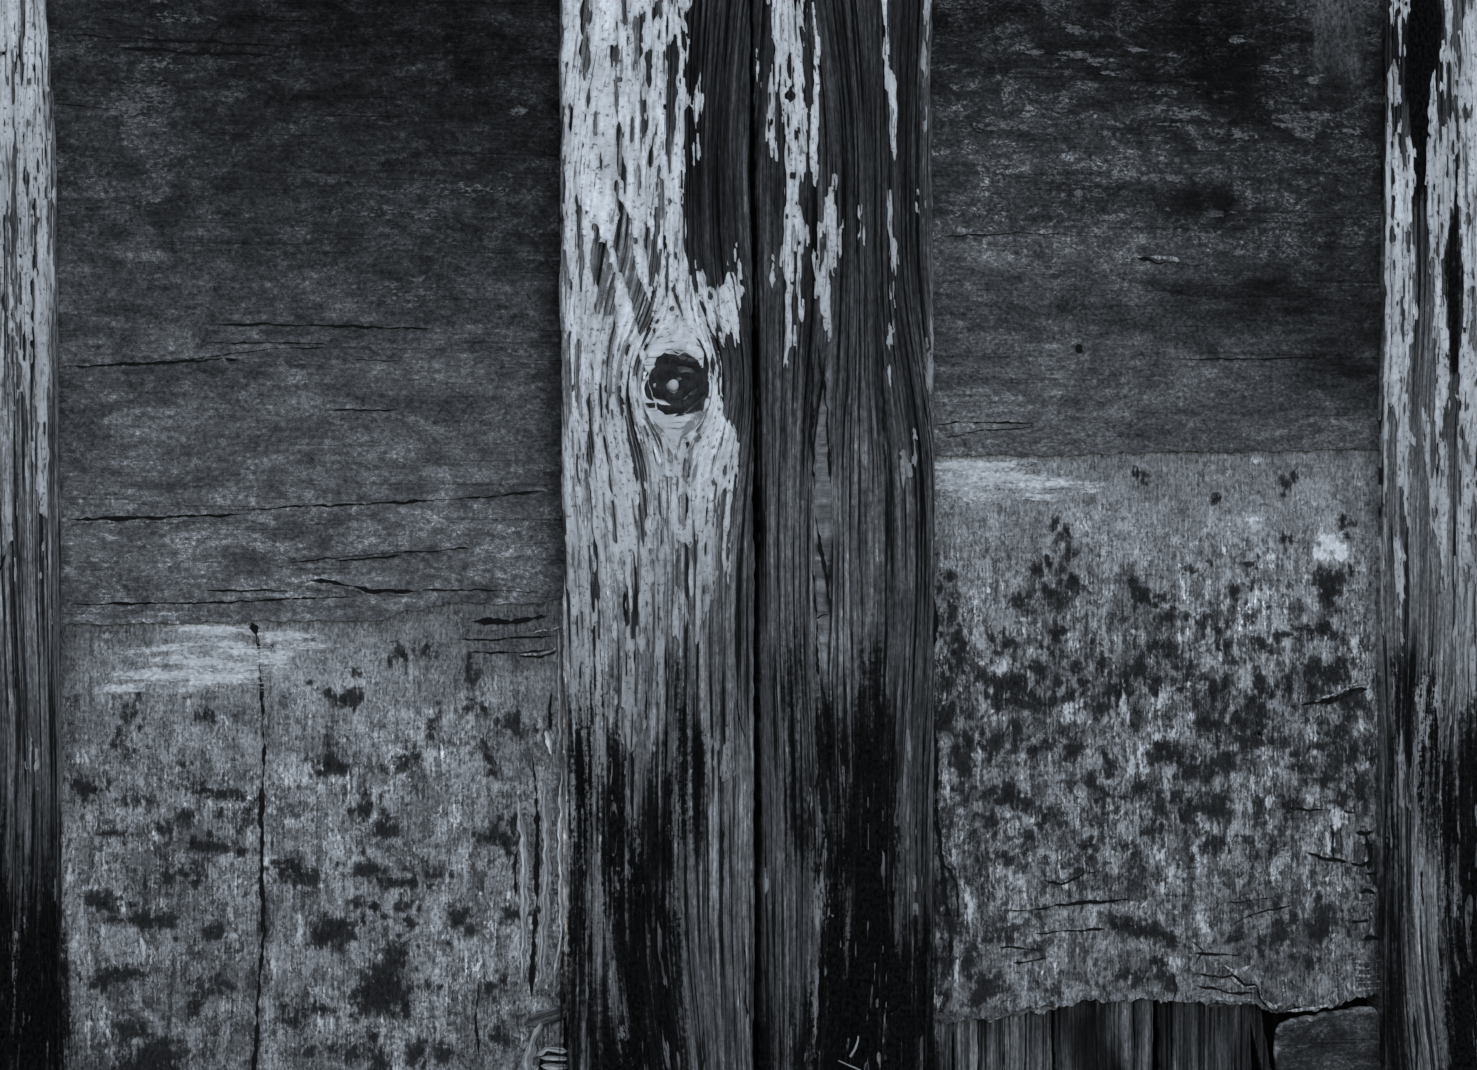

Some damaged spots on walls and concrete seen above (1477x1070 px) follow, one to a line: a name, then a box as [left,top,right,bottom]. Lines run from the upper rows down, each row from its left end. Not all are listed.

peeling [0,0,56,581]
water stain [0,797,204,1070]
crack [65,322,428,368]
water stain [70,699,454,1070]
crack [71,490,554,524]
crack [77,547,561,1070]
water stain [307,667,365,715]
crack [328,405,394,413]
peeling [561,0,745,1044]
peeling [756,0,865,368]
water stain [933,513,1477,1070]
peeling [1382,0,1477,1070]